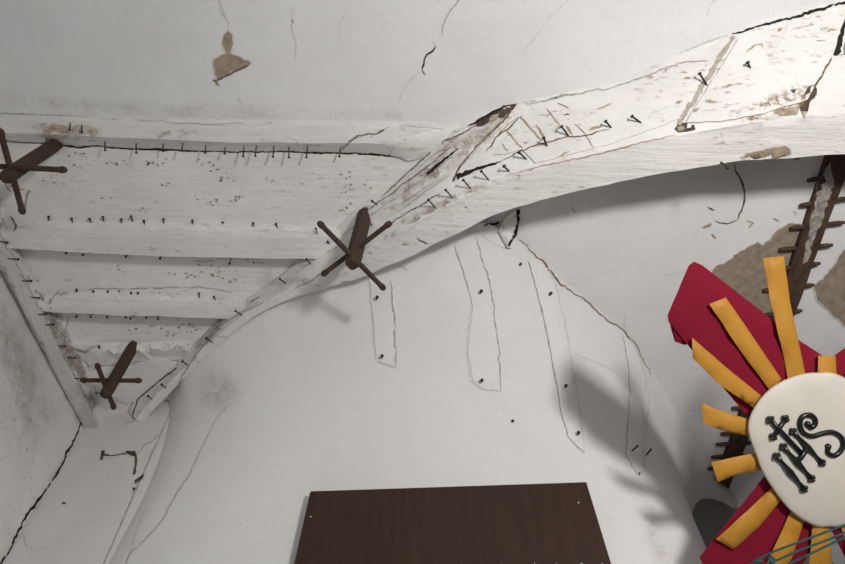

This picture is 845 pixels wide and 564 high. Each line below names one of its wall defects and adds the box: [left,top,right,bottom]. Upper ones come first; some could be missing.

crack [0,183,230,564]
crack [100,297,262,564]
flaking render [212,30,251,85]
crack [0,0,845,289]
crack [454,208,652,473]
spalling [741,145,800,161]
flaking render [711,162,834,313]
flaking render [813,249,845,327]